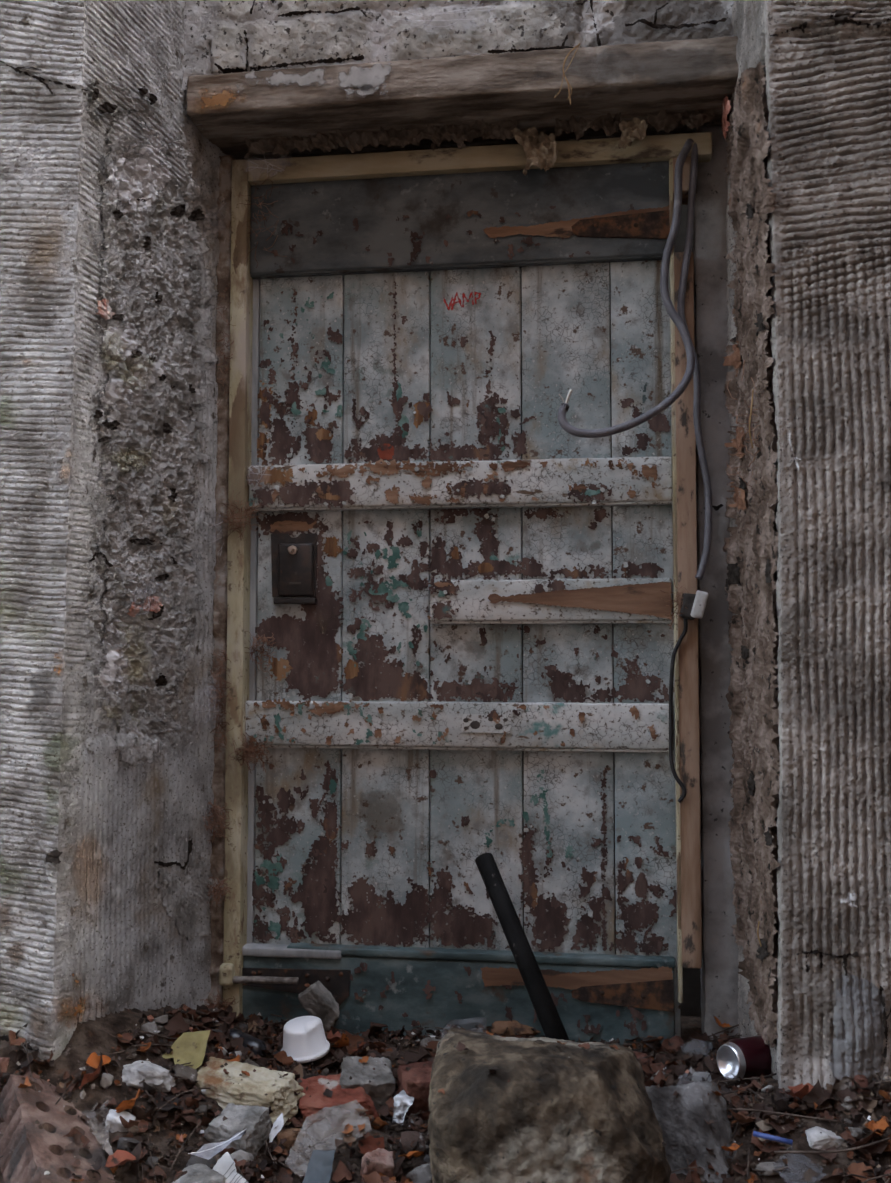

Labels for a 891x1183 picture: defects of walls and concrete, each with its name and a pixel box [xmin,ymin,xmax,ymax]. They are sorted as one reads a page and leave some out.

peeling [247,281,672,747]
crack [154,838,193,870]
spalling [298,980,340,1032]
peeling [252,760,510,949]
peeling [464,966,525,989]
peeling [484,765,677,1006]